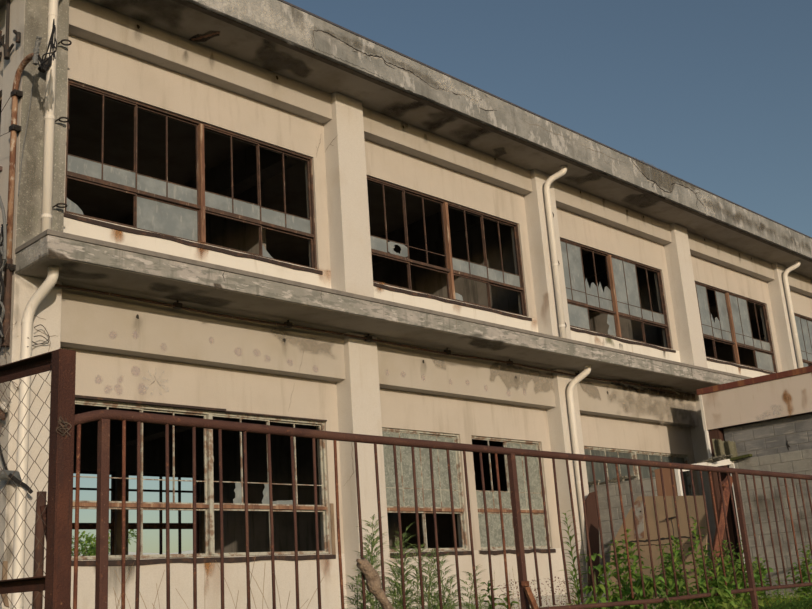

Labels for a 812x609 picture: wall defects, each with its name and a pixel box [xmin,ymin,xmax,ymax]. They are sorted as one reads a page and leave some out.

crack [312,30,493,111]
crack [523,120,706,212]
spalling [611,380,696,401]